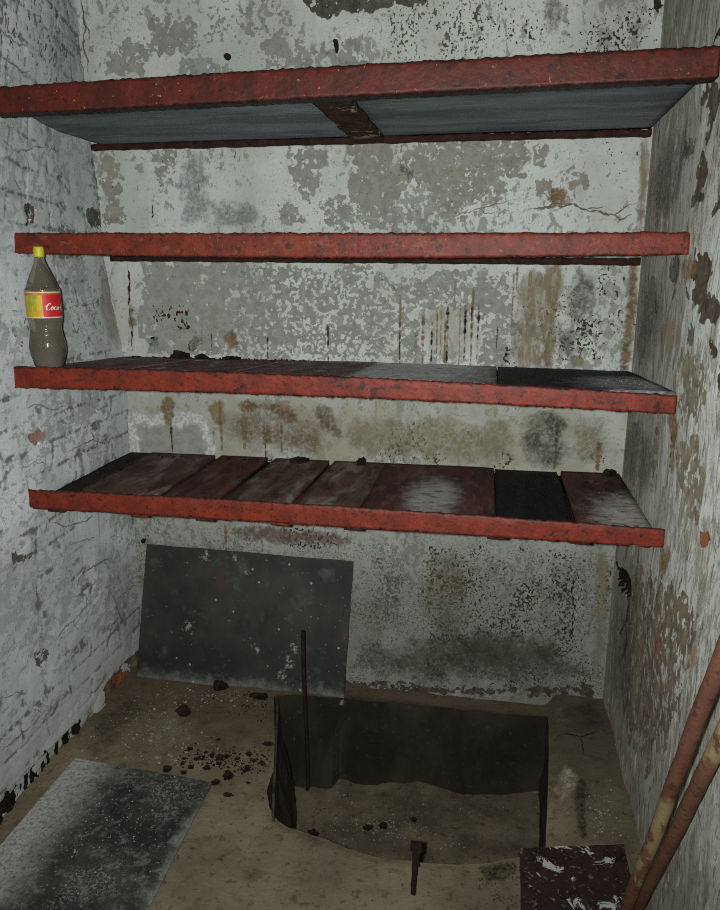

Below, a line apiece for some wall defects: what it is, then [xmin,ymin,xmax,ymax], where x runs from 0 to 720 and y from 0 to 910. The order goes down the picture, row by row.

spalling [682,81,720,208]
crack [453,201,639,221]
corrosion [511,265,559,367]
corrosion [620,266,637,370]
corrosion [161,397,174,452]
damp [575,425,618,470]
peeling [676,247,720,548]
crack [58,557,139,637]
damp [347,543,612,691]
crack [0,690,61,751]
spalling [0,720,81,825]
peeling [615,558,699,785]